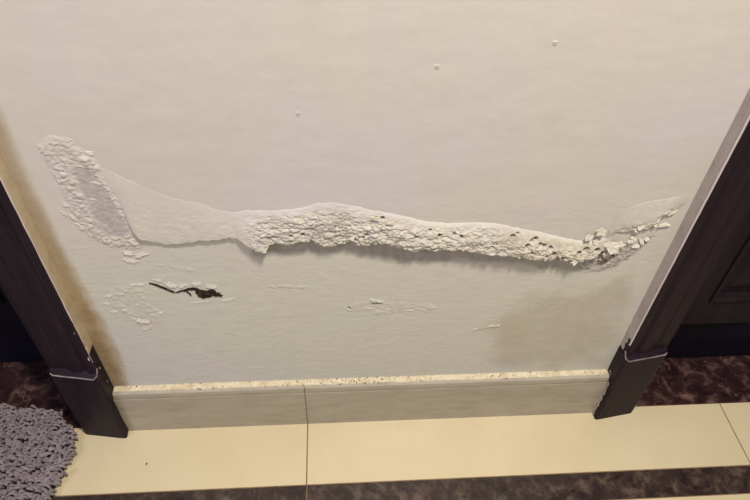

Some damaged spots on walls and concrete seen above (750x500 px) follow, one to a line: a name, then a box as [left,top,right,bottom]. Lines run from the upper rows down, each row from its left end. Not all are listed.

crack [149,278,235,304]